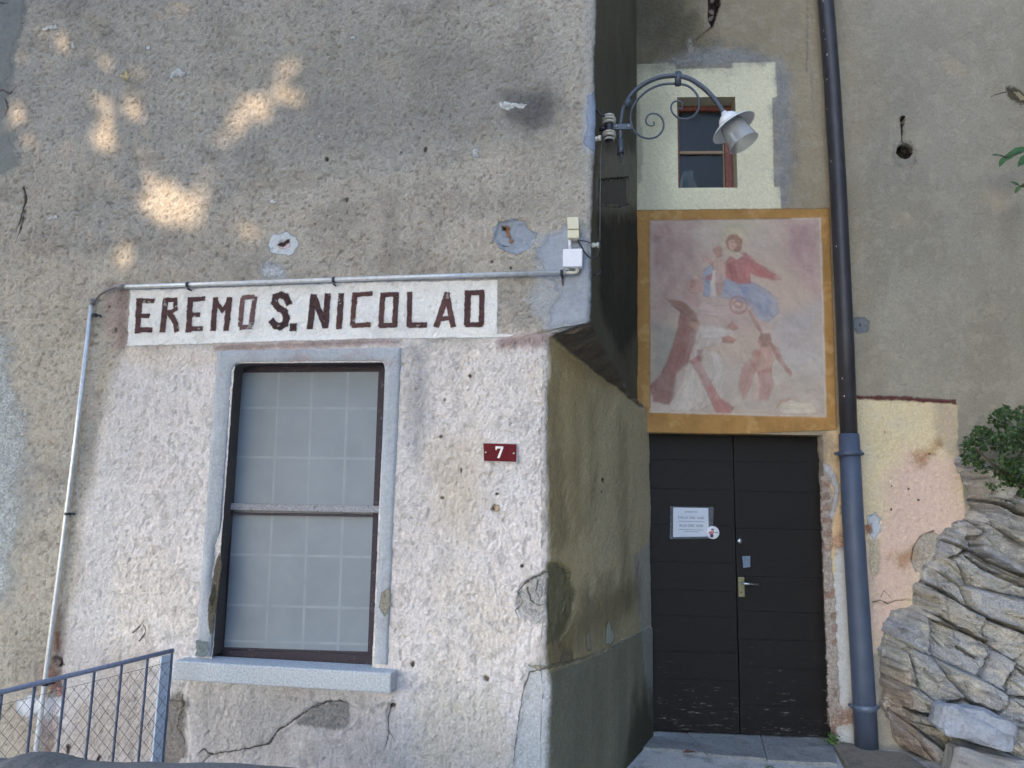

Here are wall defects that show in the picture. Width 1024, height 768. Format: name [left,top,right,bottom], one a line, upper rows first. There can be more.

peeling [268,232,299,256]
spalling [493,218,537,255]
peeling [865,512,881,540]
spalling [195,553,222,657]
spalling [379,588,391,616]
flaking render [519,572,548,623]
flaking render [820,465,853,728]
crack [177,694,351,761]